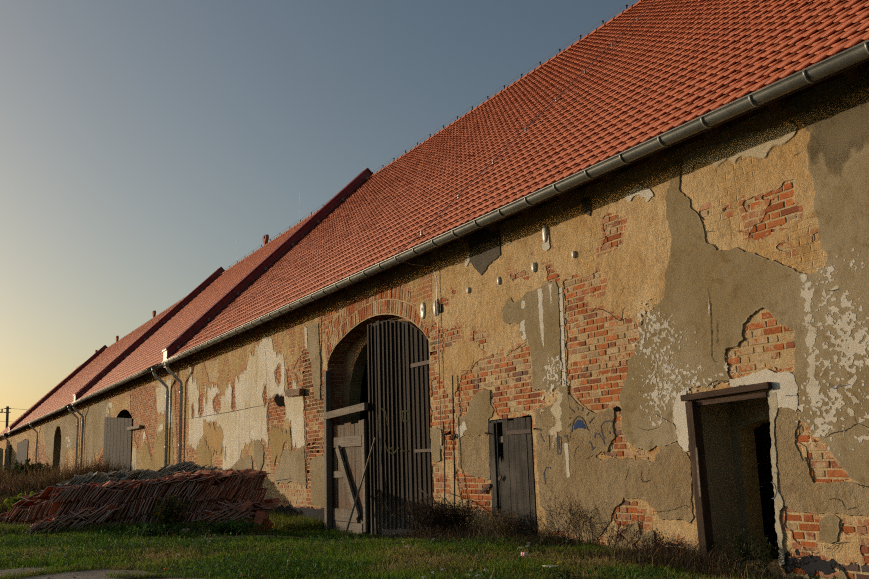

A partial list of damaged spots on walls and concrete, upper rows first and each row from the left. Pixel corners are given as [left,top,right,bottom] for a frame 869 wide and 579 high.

flaking render [739,179,799,252]
peeling [810,248,864,329]
flaking render [175,376,197,464]
flaking render [192,394,221,417]
flaking render [205,359,219,383]
flaking render [253,283,460,508]
flaking render [430,265,804,517]
peeling [795,342,869,483]
flaking render [612,500,645,534]
flaking render [784,506,869,579]